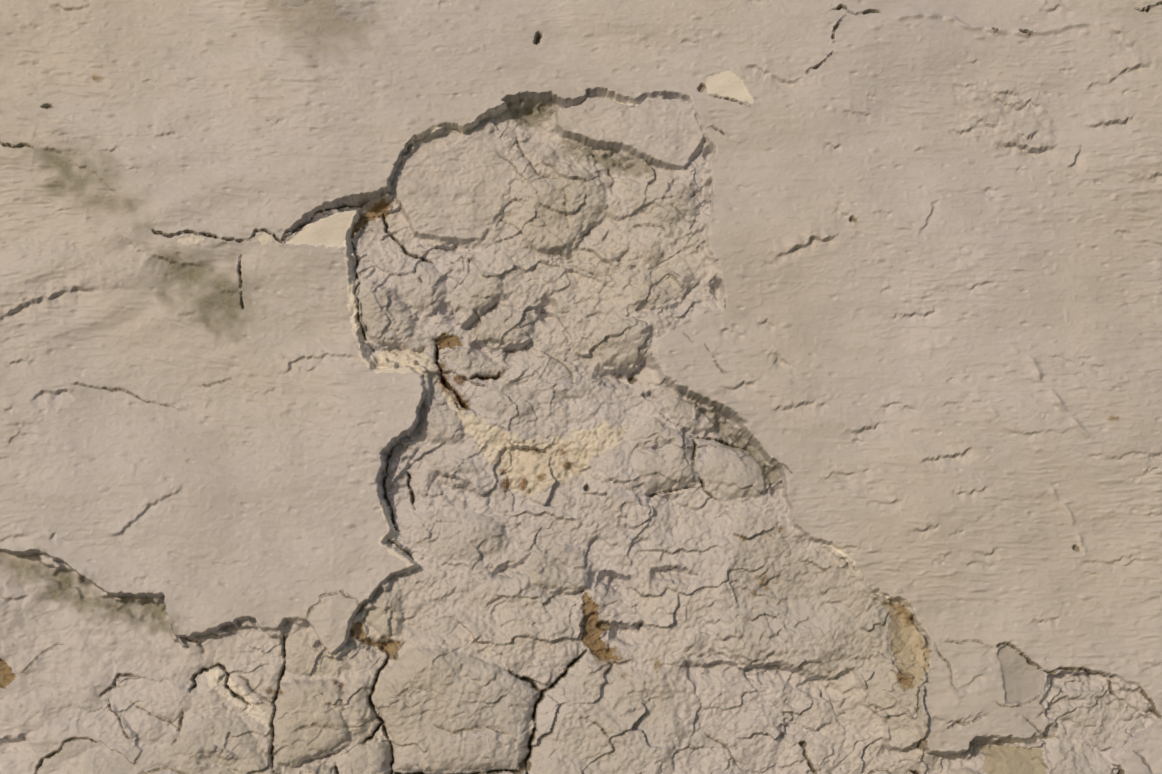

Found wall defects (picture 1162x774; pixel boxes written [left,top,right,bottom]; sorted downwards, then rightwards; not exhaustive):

crack [832,5,880,39]
spalling [698,70,754,104]
spalling [177,234,205,246]
spalling [257,232,273,245]
crack [154,201,477,309]
crack [351,242,375,353]
spalling [285,86,1160,774]
crack [37,590,441,774]
spalling [0,549,541,774]
crack [434,650,587,774]
crack [802,746,817,774]
crack [939,641,1162,739]